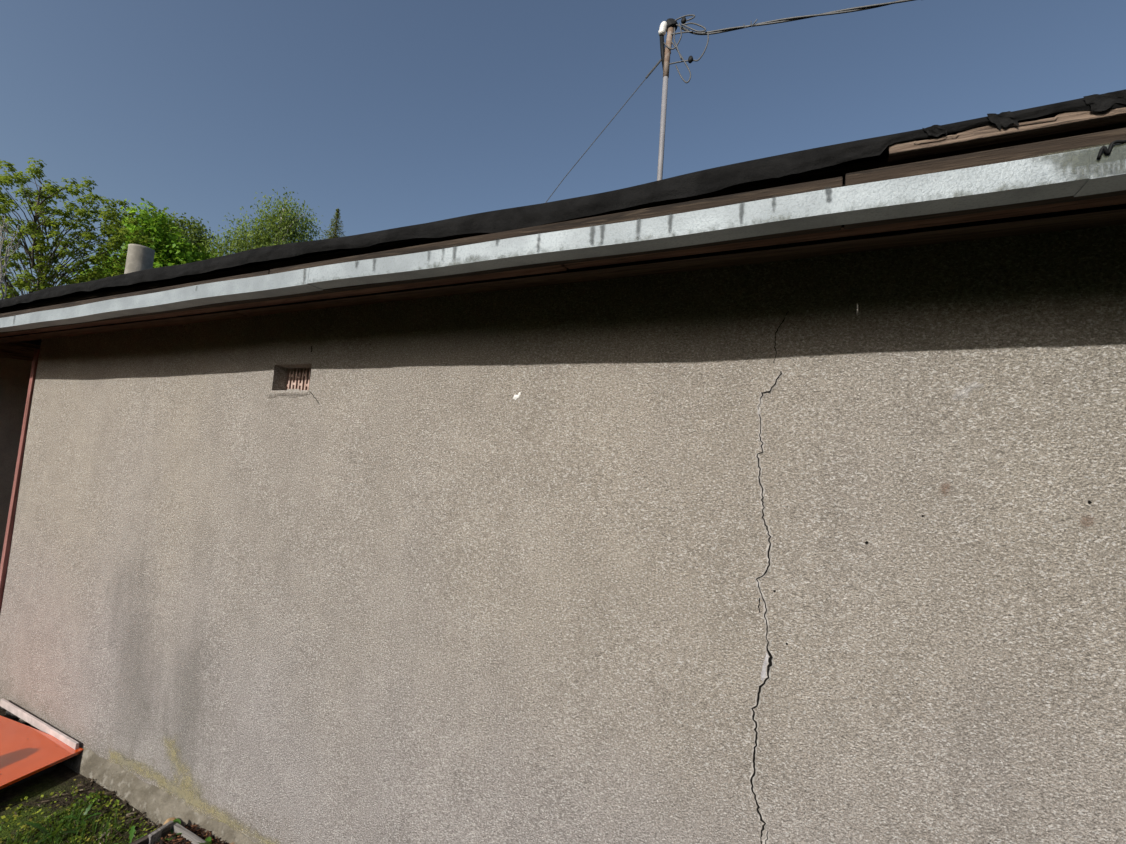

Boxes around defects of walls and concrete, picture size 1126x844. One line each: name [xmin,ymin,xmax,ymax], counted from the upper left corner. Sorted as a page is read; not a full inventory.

crack [749,311,789,844]